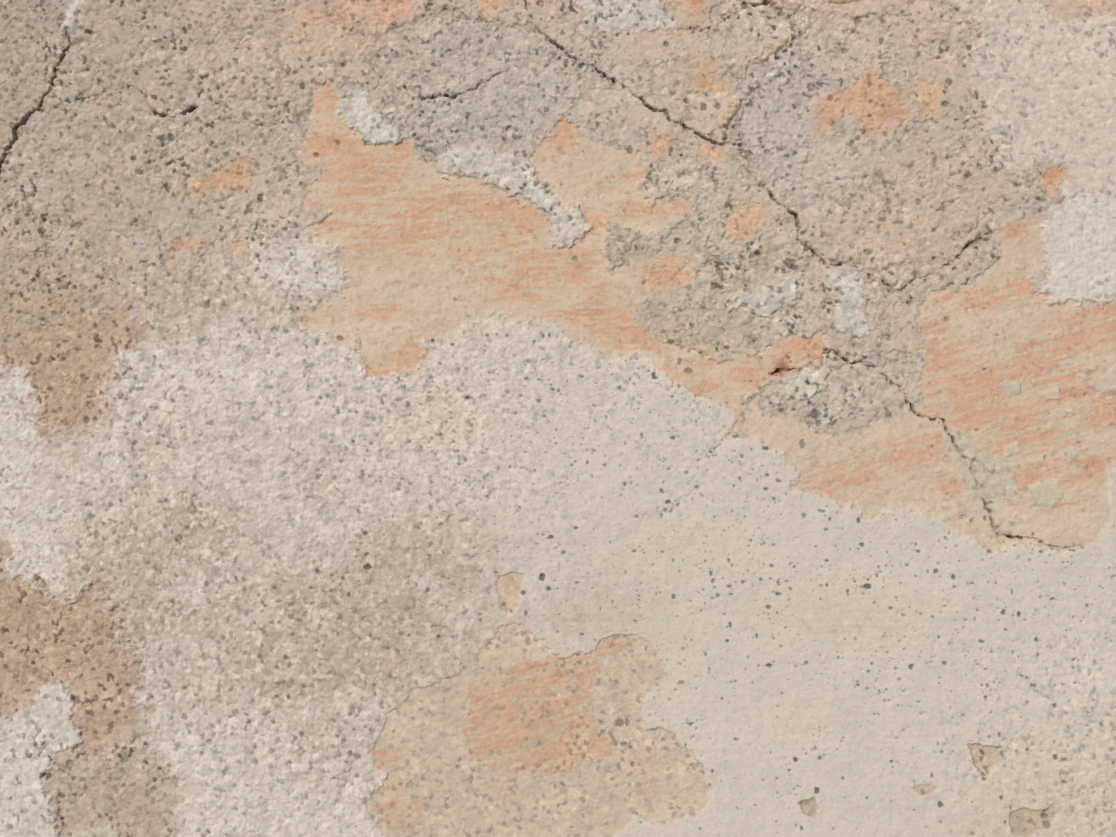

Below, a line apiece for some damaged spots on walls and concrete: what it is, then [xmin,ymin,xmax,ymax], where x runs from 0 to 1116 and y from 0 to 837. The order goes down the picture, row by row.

crack [0,28,291,174]
crack [404,65,515,113]
crack [510,0,756,153]
crack [679,0,799,53]
peeling [297,0,1116,555]
crack [757,182,1000,303]
peeling [4,301,153,439]
crack [632,349,1082,553]
peeling [0,581,146,837]
peeling [366,573,712,837]